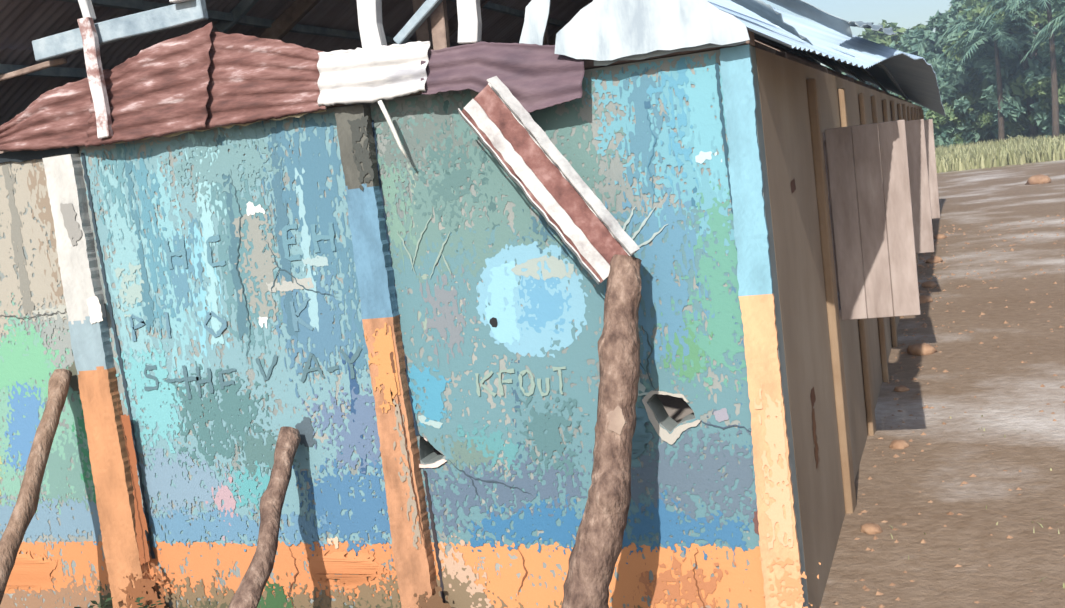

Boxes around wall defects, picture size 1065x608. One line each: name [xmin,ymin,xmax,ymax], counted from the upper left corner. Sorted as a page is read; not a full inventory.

rust [0,22,327,152]
rust [421,41,585,113]
crack [0,311,67,319]
peeling [0,159,96,517]
peeling [80,90,607,608]
crack [372,120,533,603]
peeling [529,52,794,552]
rust [812,406,820,469]